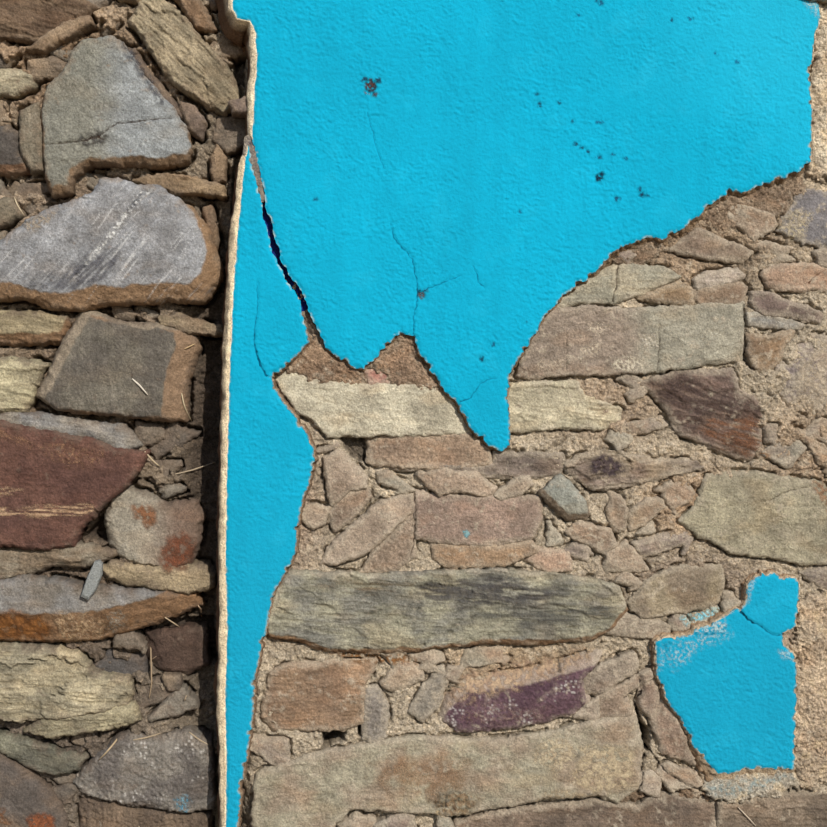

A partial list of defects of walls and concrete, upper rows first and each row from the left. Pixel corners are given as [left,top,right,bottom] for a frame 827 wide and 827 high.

flaking render [213,0,257,827]
crack [243,135,325,348]
flaking render [237,0,827,827]